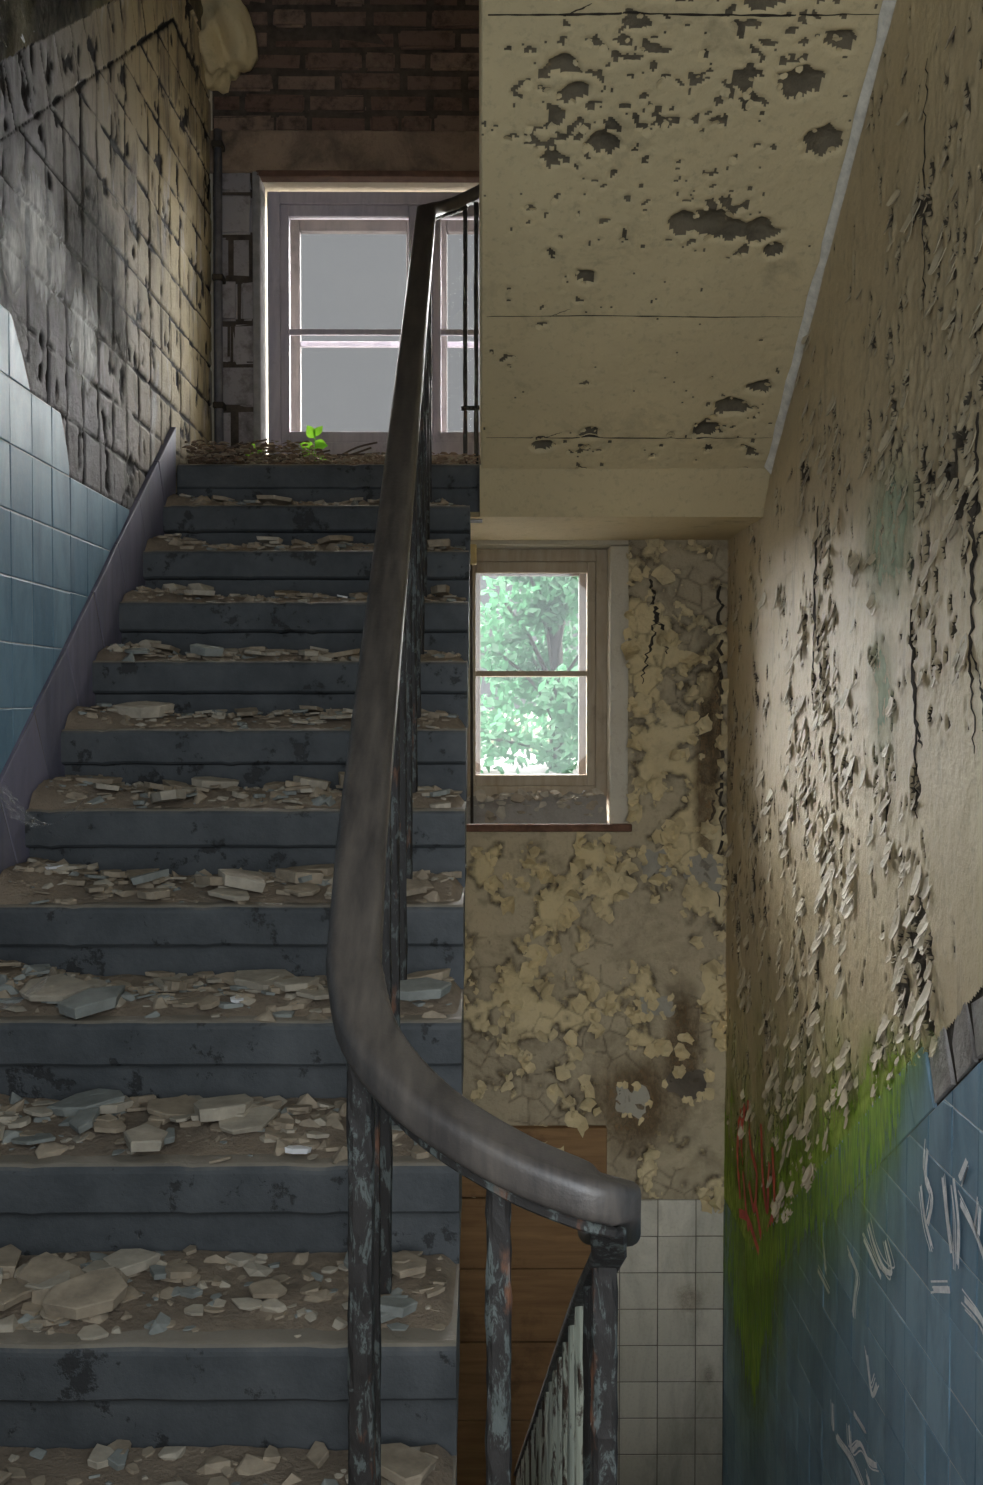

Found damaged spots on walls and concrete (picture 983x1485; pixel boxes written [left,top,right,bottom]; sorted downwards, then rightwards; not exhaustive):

peeling [0,0,857,509]
flaking render [400,53,983,1223]
water stain [724,1052,915,1299]